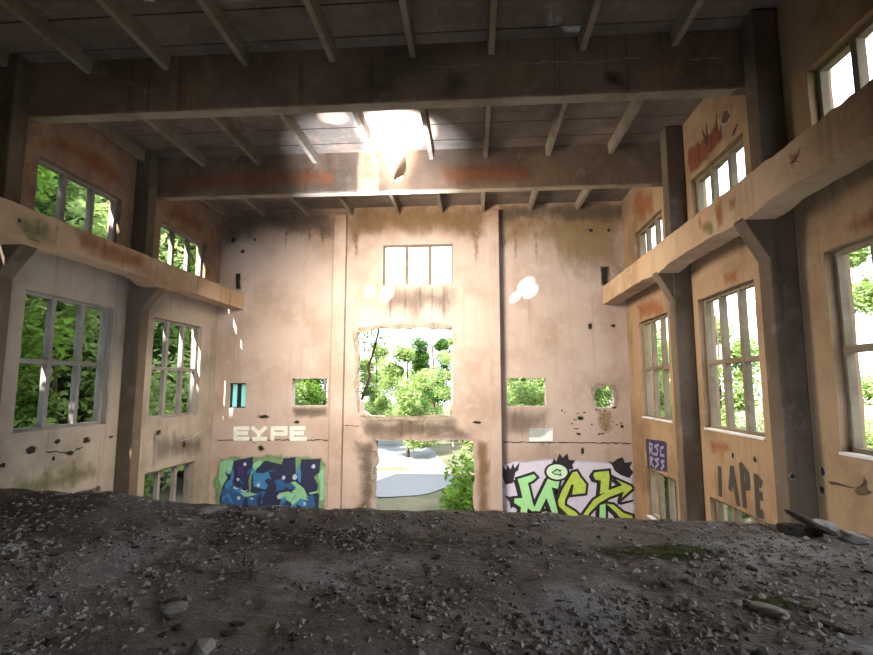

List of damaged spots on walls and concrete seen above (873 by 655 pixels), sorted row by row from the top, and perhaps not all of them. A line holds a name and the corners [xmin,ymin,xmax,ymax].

water stain [227,213,328,237]
water stain [352,210,480,237]
water stain [504,207,622,261]
spalling [352,322,453,422]
spalling [23,445,40,456]
spalling [50,436,92,462]